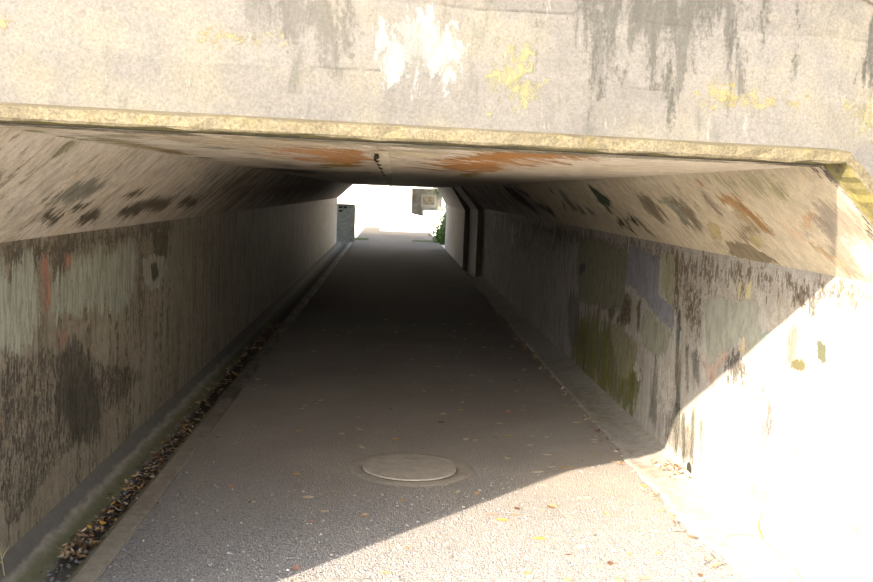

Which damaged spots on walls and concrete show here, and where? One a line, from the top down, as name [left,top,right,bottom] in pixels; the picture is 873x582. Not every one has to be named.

leakage [628,0,743,122]
leakage [861,16,873,87]
rust [248,145,394,173]
rust [407,150,610,177]
leakage [671,310,699,463]